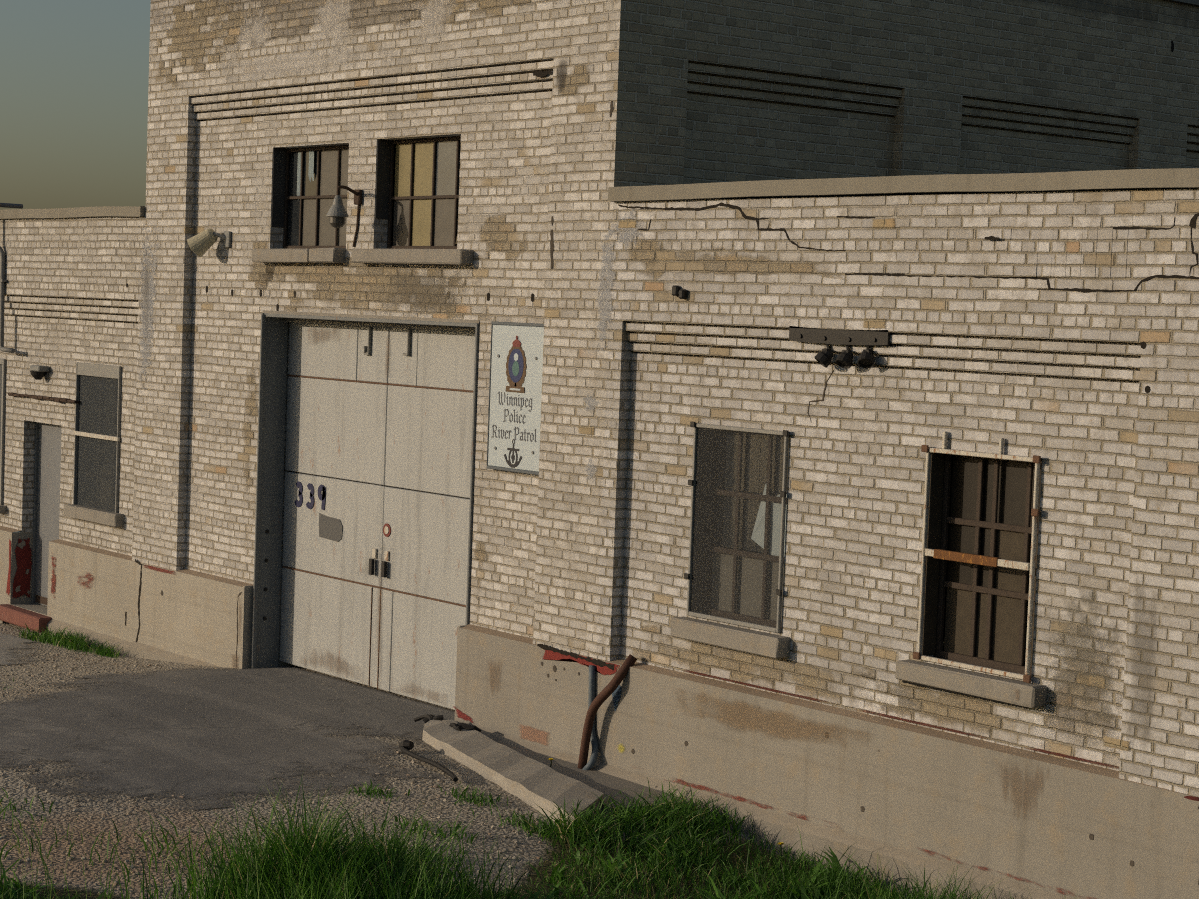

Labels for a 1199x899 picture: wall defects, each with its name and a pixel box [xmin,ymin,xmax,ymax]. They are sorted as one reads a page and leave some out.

crack [618,202,1199,293]
crack [125,559,149,642]
spalling [537,644,620,681]
leakage [721,704,834,737]